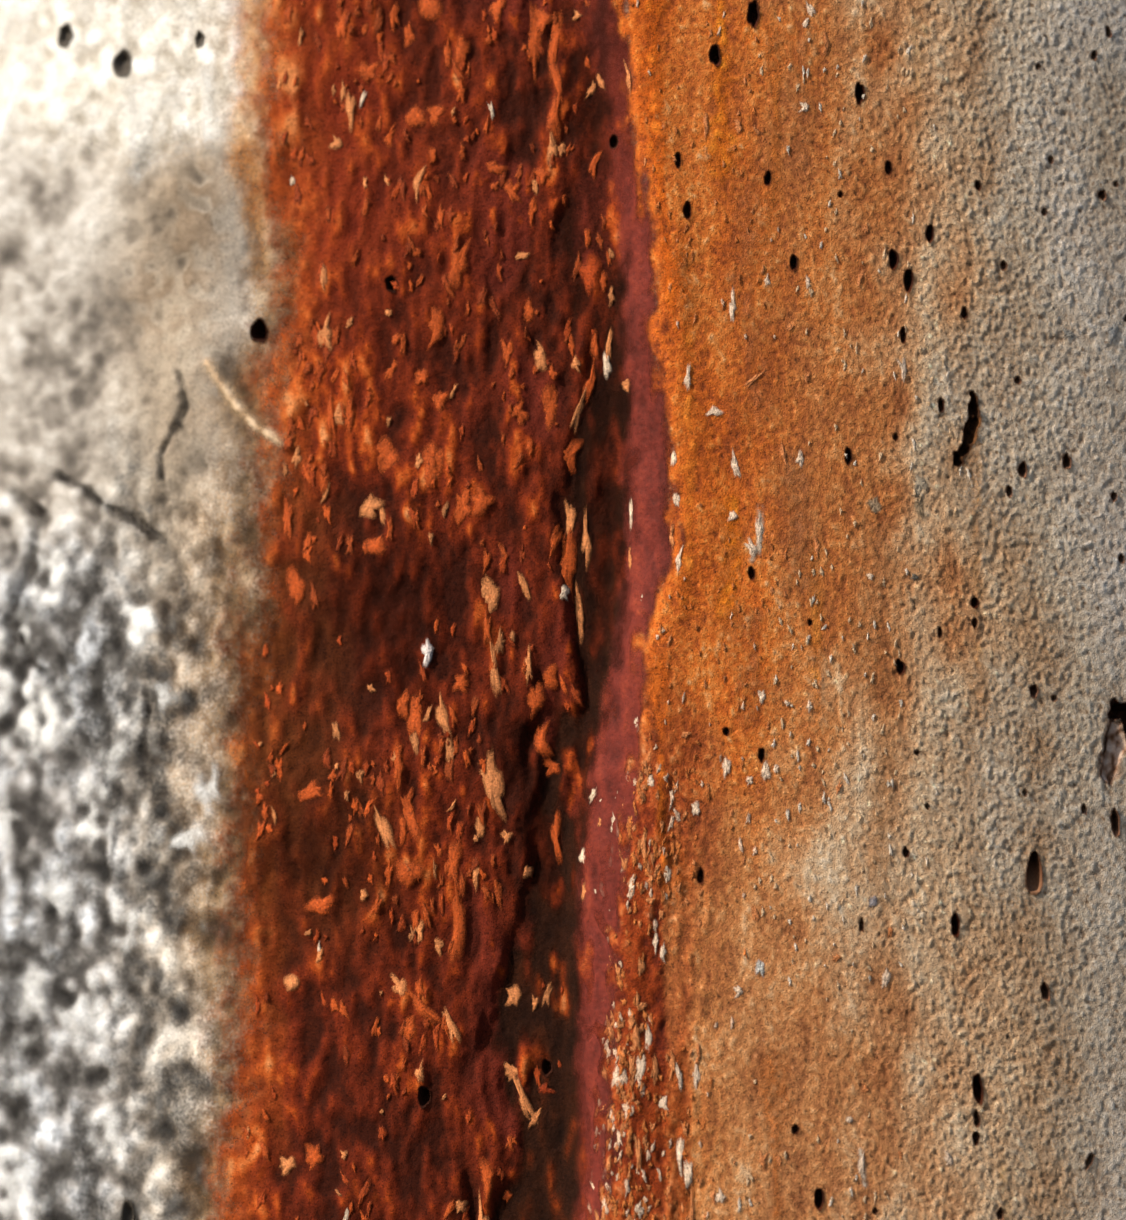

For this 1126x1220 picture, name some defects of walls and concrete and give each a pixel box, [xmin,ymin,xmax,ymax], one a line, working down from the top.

rust [165,0,638,1220]
rust [588,0,1083,1220]